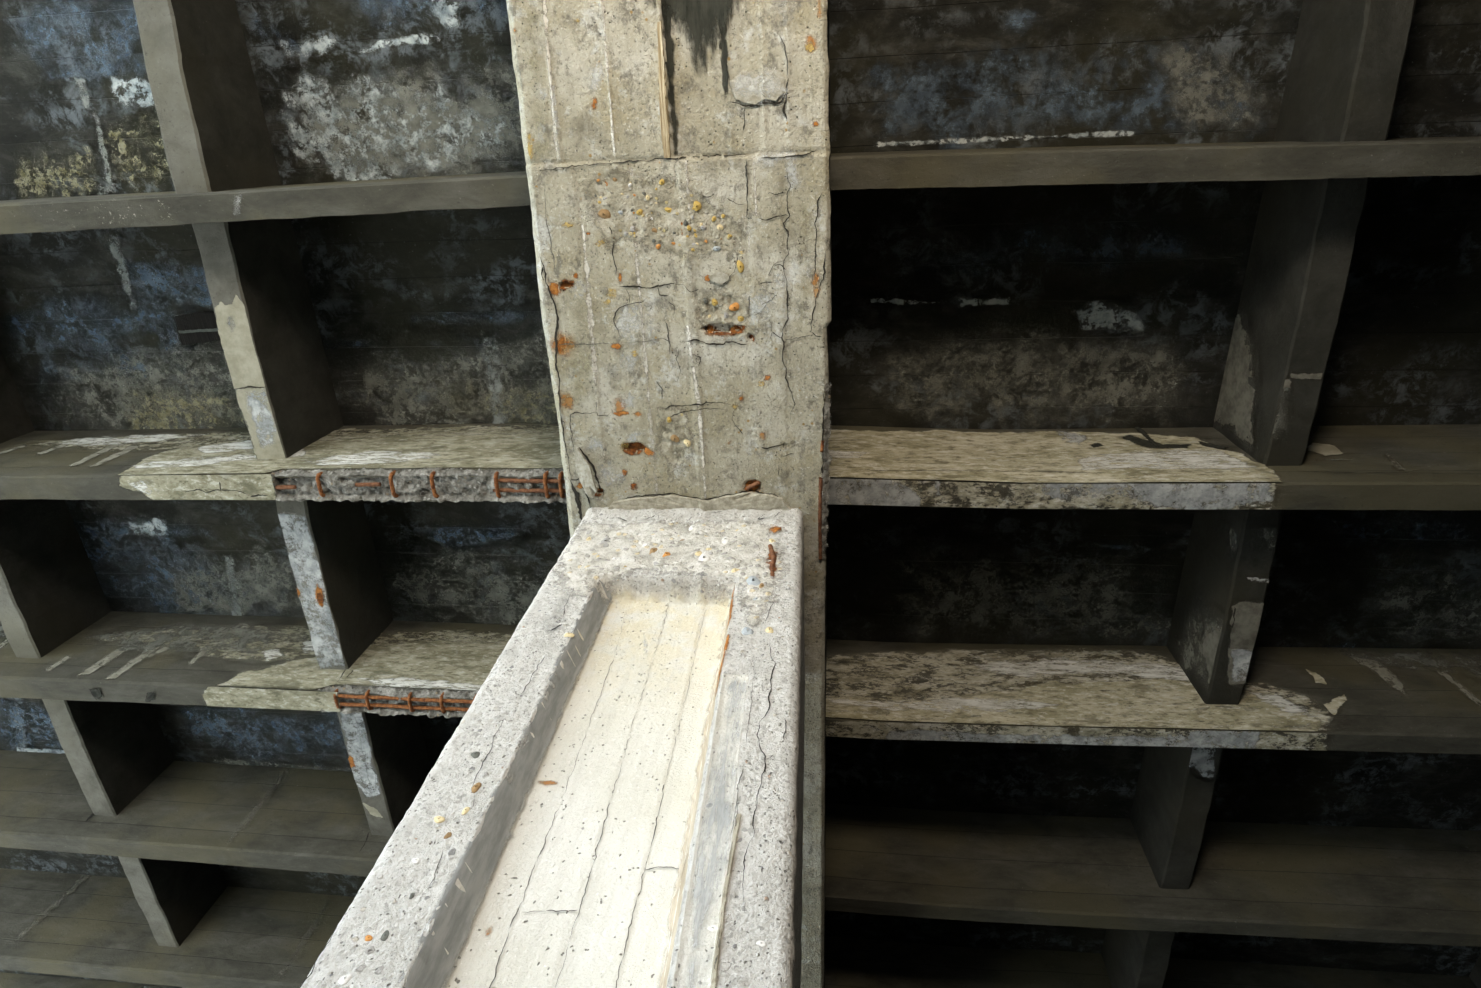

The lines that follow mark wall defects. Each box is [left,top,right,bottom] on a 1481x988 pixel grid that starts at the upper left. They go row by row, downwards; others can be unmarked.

efflorescence [283,64,522,181]
leakage [360,0,458,52]
leakage [653,0,739,155]
corrosion [549,273,578,296]
crack [539,37,826,523]
corrosion [552,335,576,354]
corrosion [613,400,641,416]
spalling [621,442,655,456]
spalling [818,383,832,560]
spalling [271,446,792,635]
corrosion [715,587,735,695]
spalling [318,685,478,718]